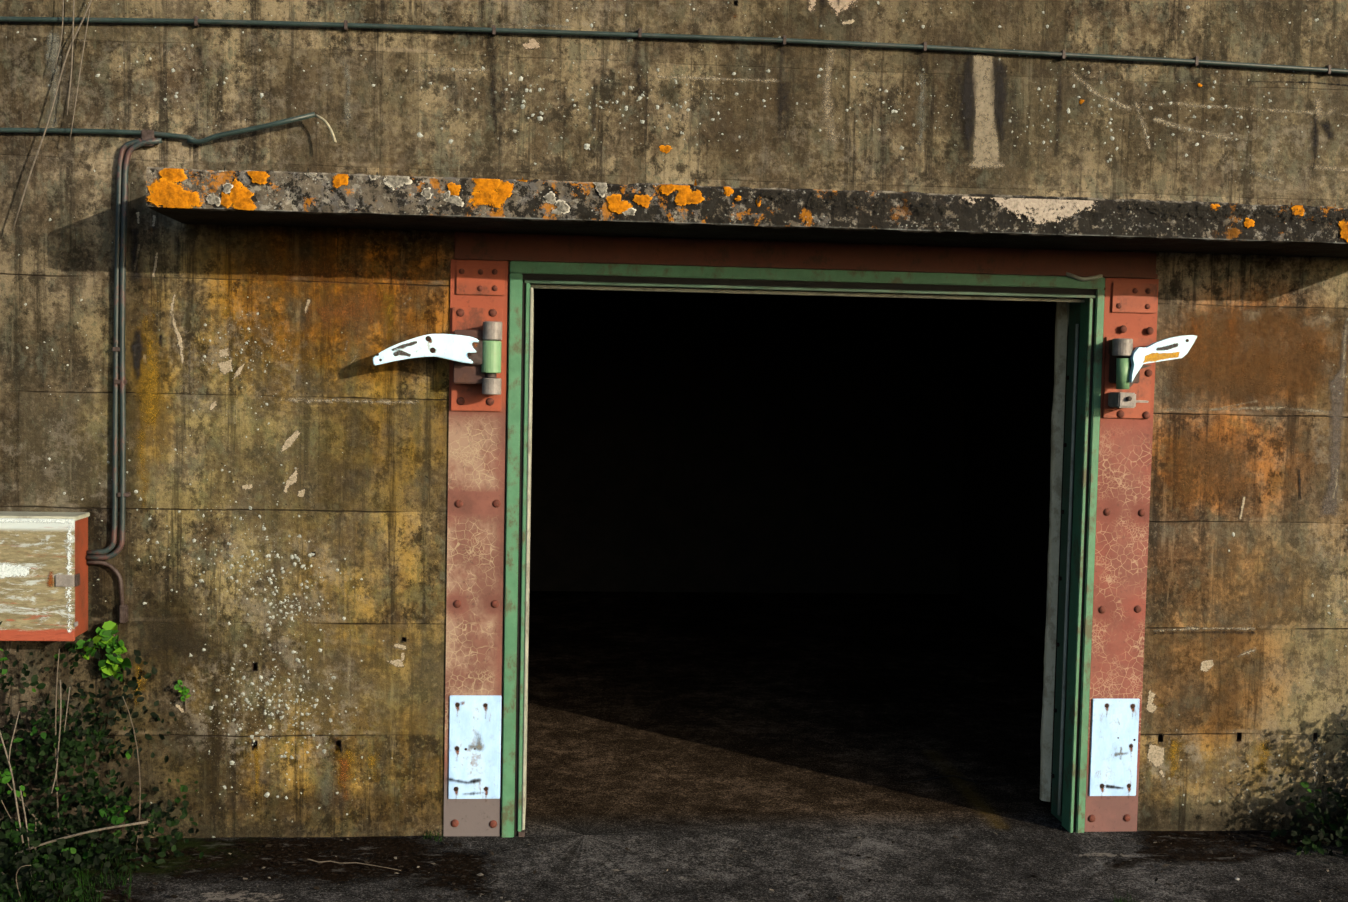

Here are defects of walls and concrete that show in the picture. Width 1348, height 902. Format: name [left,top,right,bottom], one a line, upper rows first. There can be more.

water stain [130,212,158,280]
water stain [131,331,162,376]
water stain [139,608,216,663]